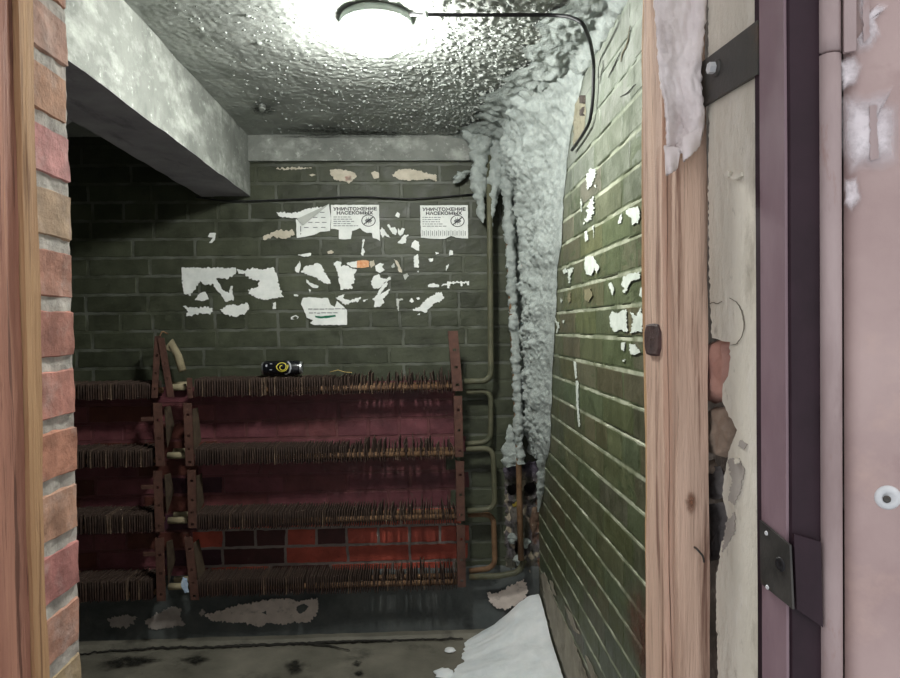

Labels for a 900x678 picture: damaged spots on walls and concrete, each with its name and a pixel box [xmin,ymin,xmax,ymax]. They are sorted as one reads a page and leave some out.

peeling [330,169,357,184]
peeling [393,169,437,181]
peeling [580,168,596,242]
peeling [618,206,640,225]
peeling [263,229,295,240]
peeling [561,256,599,303]
peeling [608,272,643,362]
flaking render [708,340,748,562]
spalling [487,460,540,610]
peeling [107,606,186,630]
peeling [196,598,319,627]